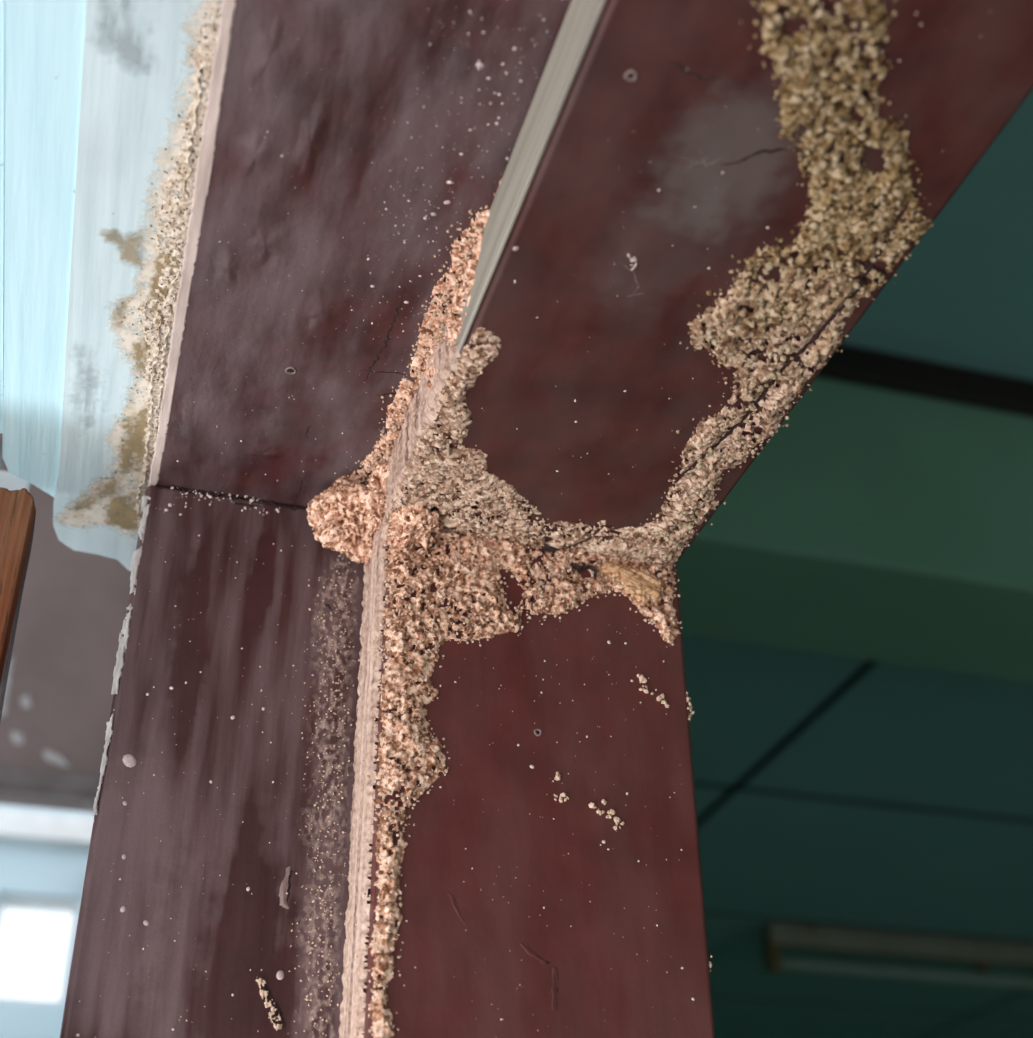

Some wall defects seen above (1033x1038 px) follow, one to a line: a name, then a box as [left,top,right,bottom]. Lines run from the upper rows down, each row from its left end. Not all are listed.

water stain [58,0,221,534]
crack [721,148,790,165]